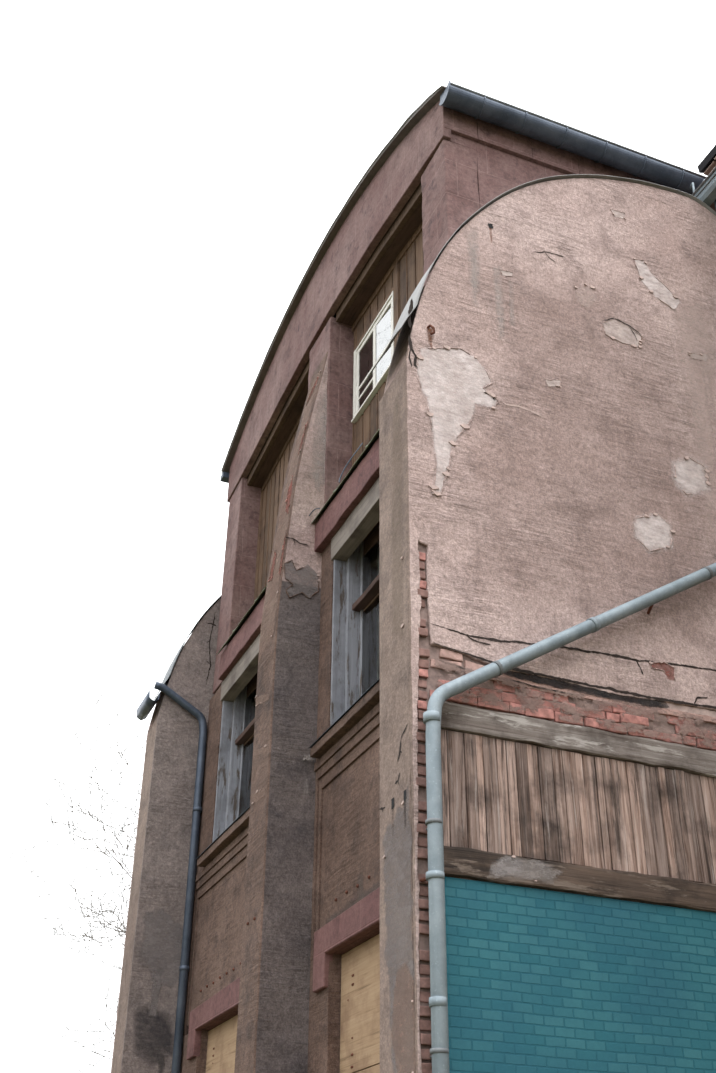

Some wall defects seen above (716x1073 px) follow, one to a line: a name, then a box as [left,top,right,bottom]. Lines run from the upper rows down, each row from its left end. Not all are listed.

peeling [633,258,679,310]
peeling [603,318,643,348]
peeling [416,345,499,496]
peeling [674,456,711,495]
peeling [258,370,321,660]
peeling [635,513,676,552]
crack [431,623,716,709]
peeling [649,660,676,680]
flaking render [447,674,716,751]
peeling [382,552,483,1073]
peeling [492,855,559,882]